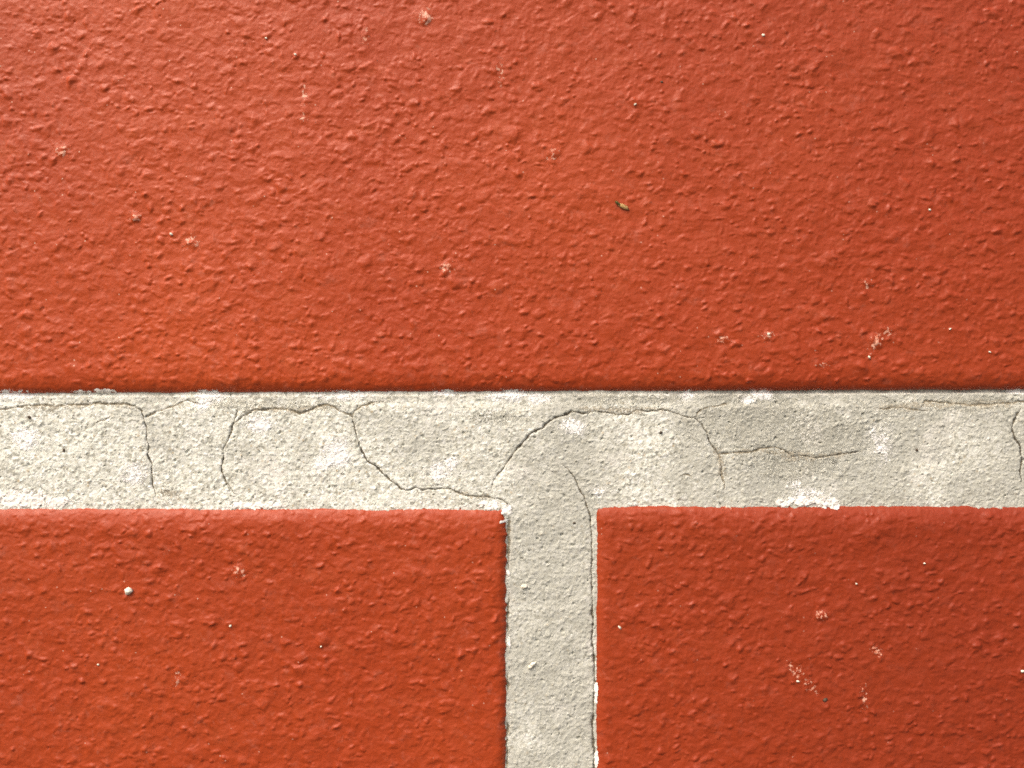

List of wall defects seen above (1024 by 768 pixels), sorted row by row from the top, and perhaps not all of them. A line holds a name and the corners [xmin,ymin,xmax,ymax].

crack [0,399,197,499]
crack [221,400,861,568]
crack [879,397,1024,482]
crack [563,465,596,768]